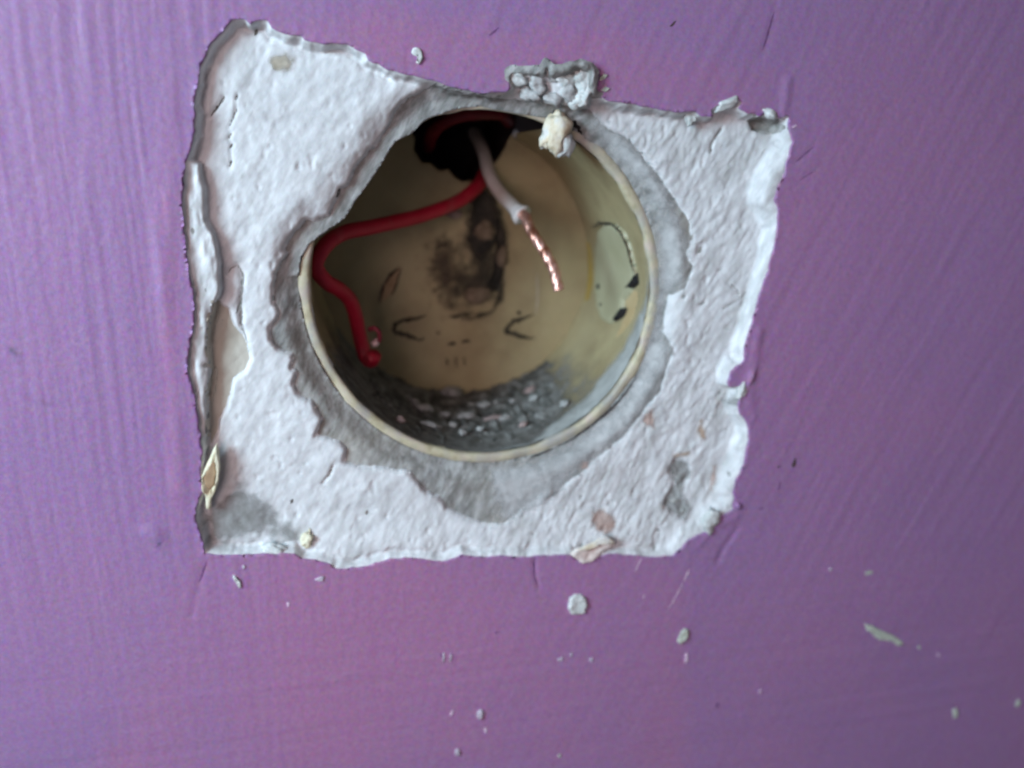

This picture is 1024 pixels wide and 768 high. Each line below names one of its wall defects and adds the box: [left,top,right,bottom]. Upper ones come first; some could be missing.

spalling [182,19,798,588]